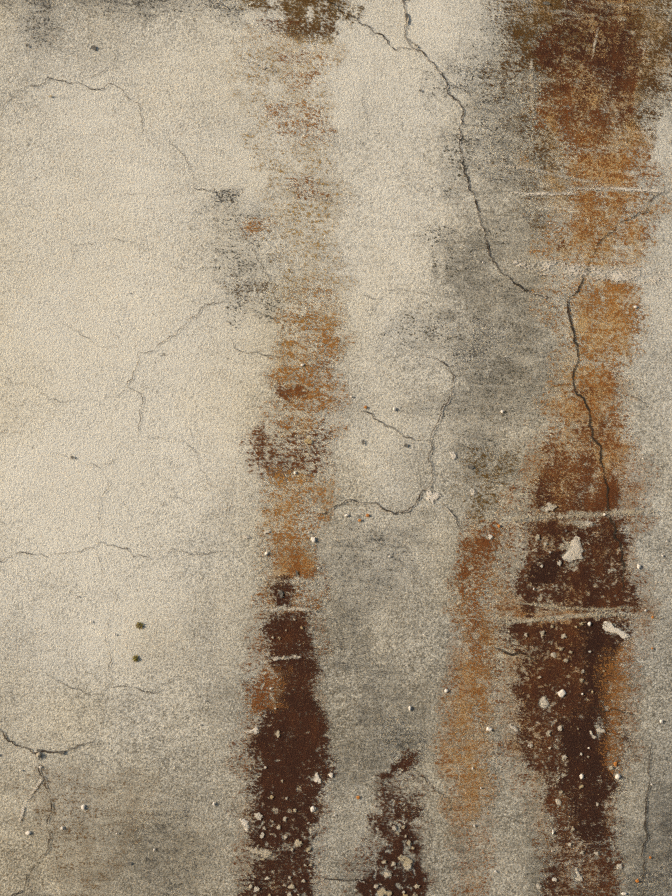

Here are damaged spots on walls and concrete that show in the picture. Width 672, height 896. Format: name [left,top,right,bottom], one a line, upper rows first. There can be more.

crack [1,287,239,695]
crack [0,8,294,370]
corrosion [219,0,364,896]
crack [314,0,671,588]
corrosion [342,0,672,896]
crack [0,723,102,896]